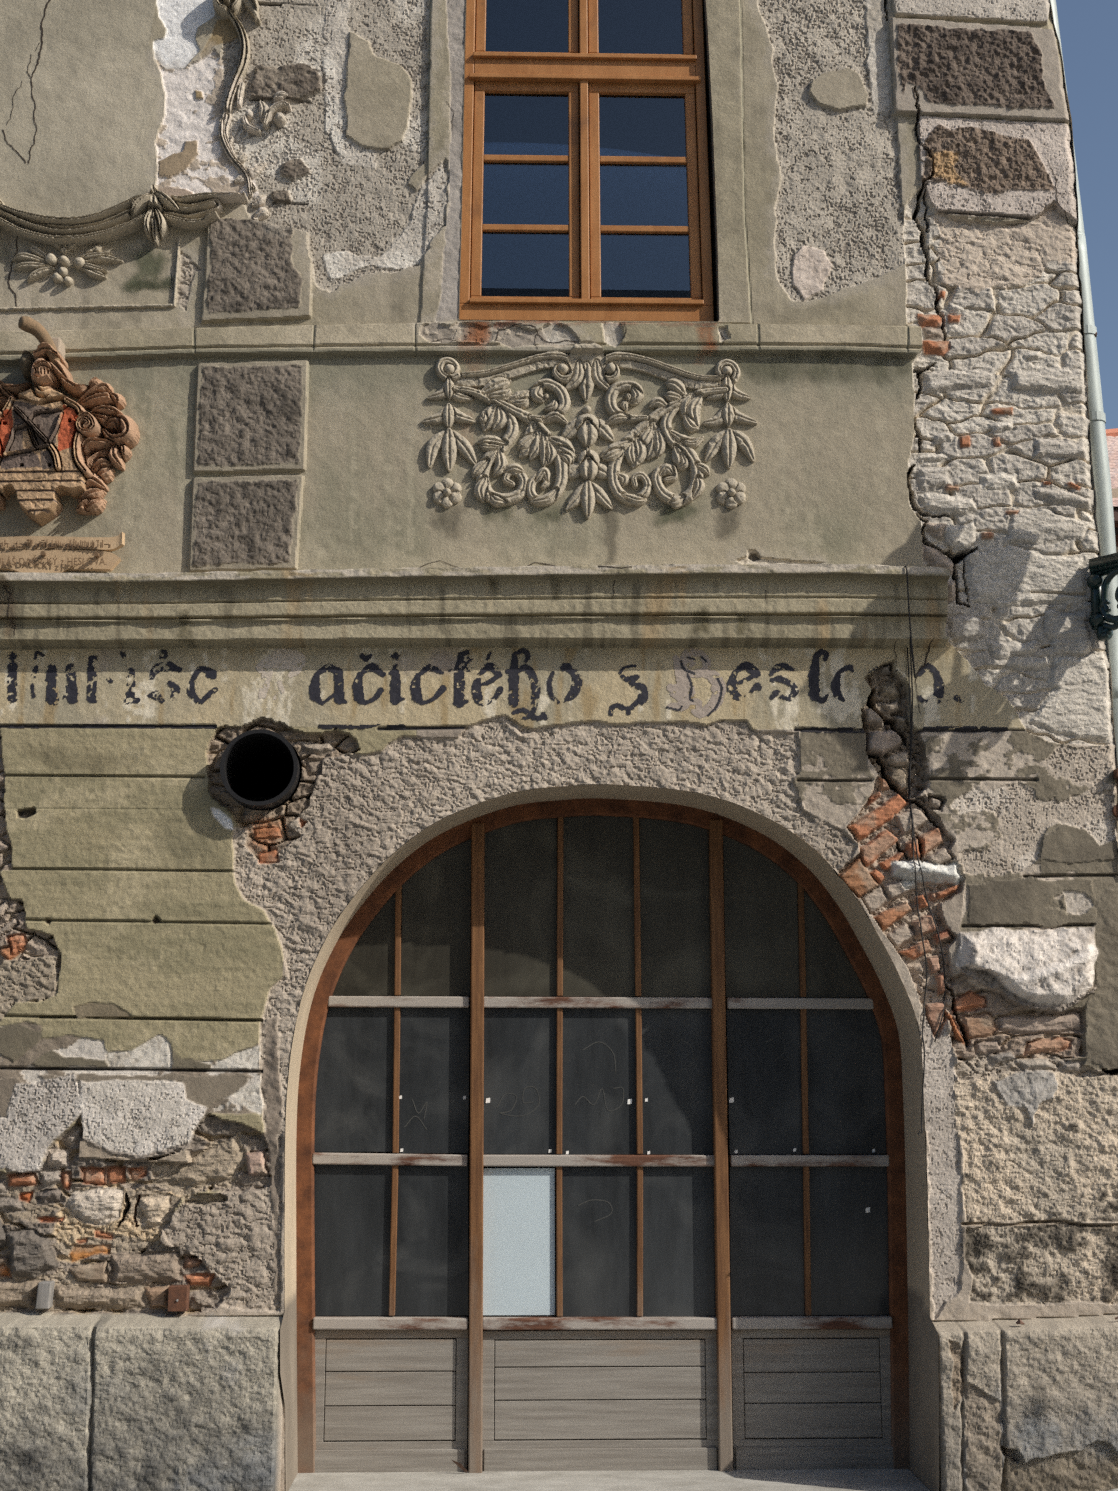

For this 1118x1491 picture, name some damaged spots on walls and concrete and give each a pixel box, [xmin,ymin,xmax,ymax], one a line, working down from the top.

crack [2,0,51,164]
flaking render [148,0,450,292]
crack [882,0,890,21]
crack [907,85,978,608]
flaking render [737,549,822,564]
flaking render [758,0,1118,1080]
spalling [207,716,360,864]
crack [866,638,939,862]
crack [946,984,972,1046]
flaking render [0,1002,272,1316]